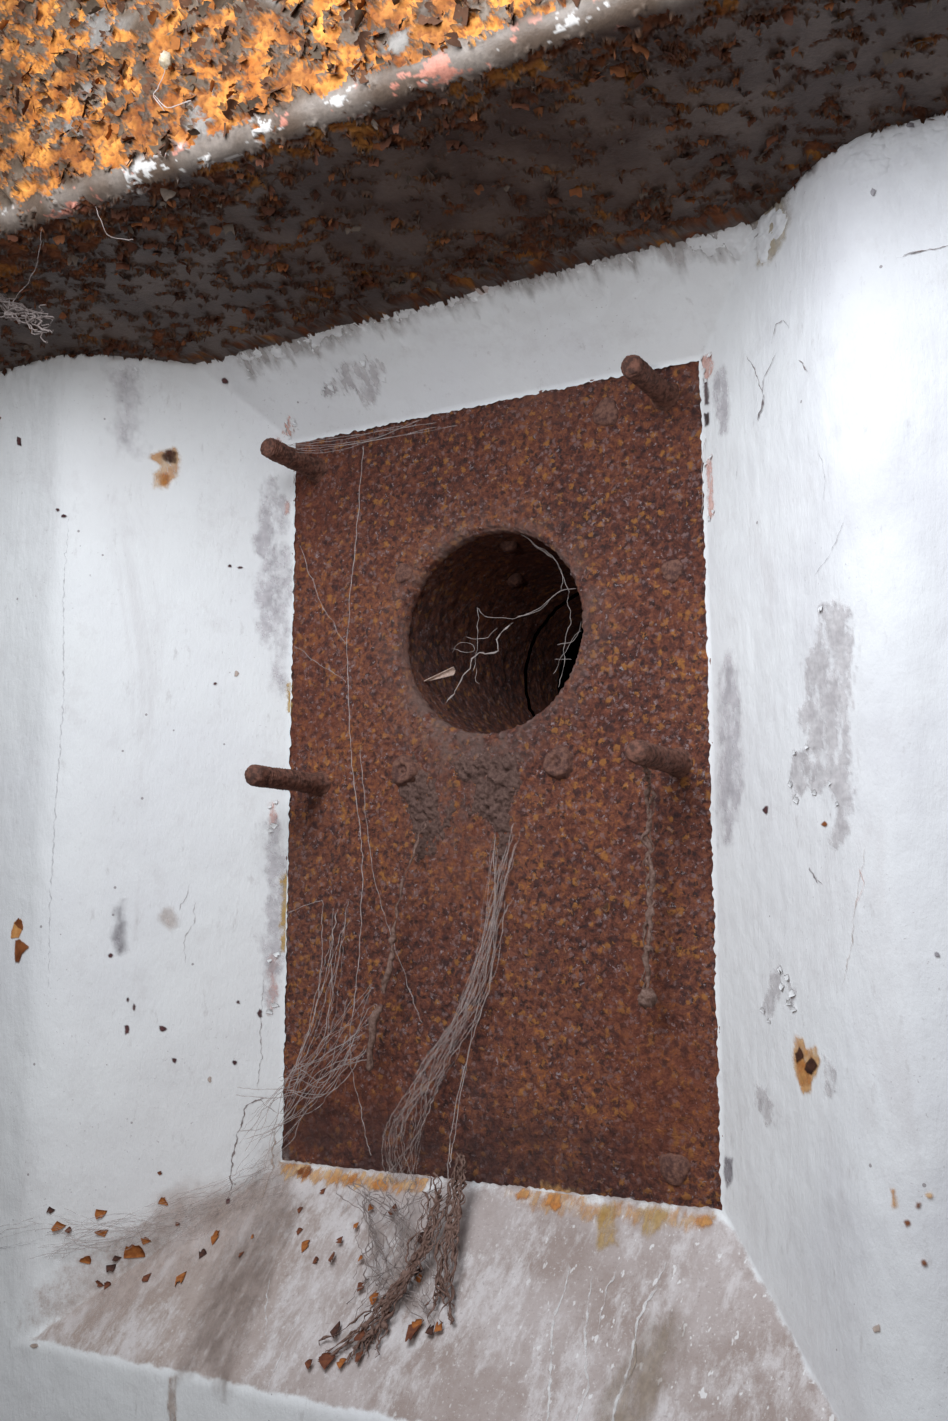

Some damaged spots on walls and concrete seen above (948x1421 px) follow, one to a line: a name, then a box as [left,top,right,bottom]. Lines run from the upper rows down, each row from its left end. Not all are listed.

rust [463,40,799,249]
rust [0,0,687,376]
rust [151,448,179,486]
rust [794,1038,819,1094]
rust [281,1162,428,1194]
rust [517,1186,714,1247]
damp [168,1379,176,1421]